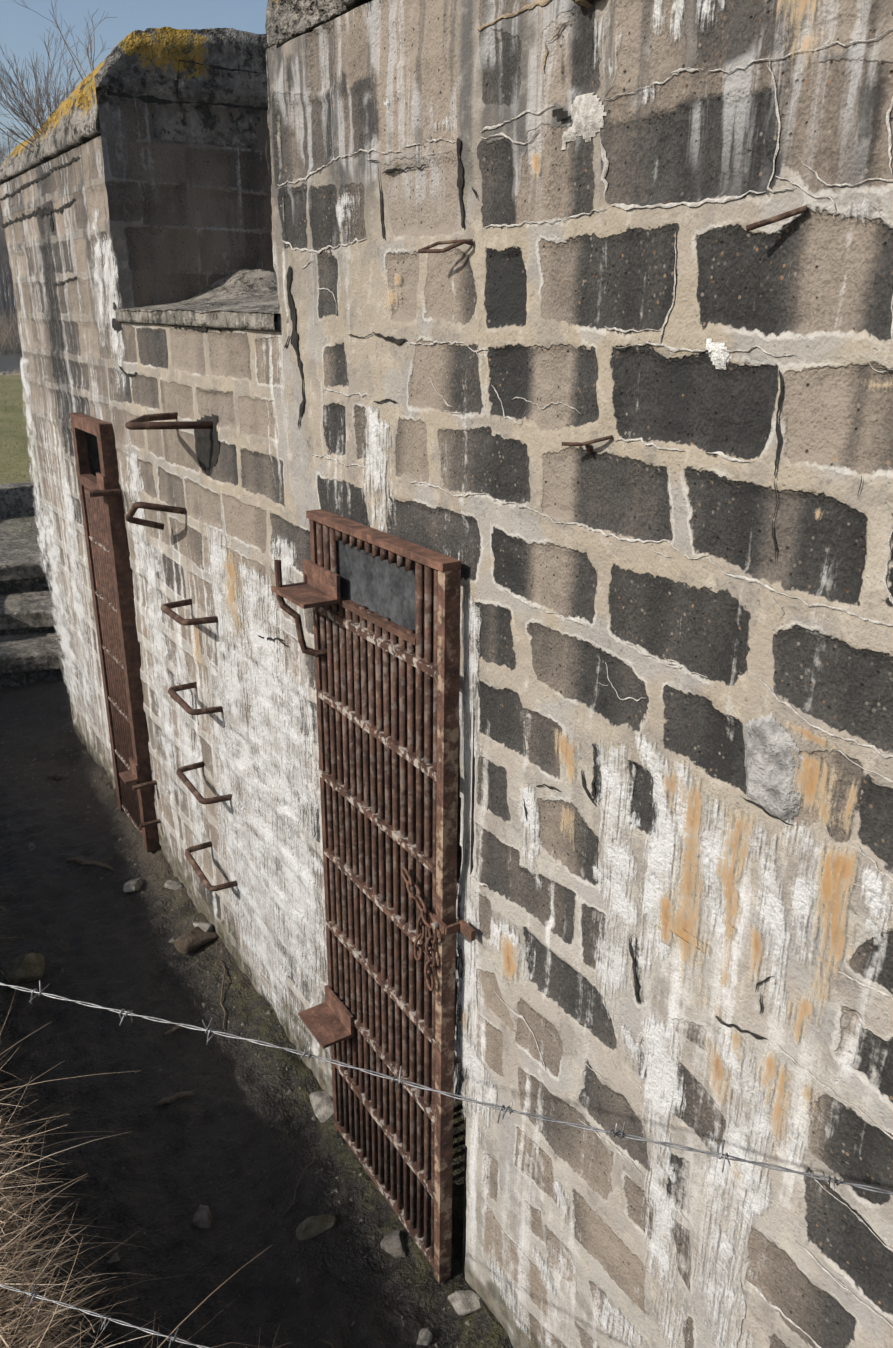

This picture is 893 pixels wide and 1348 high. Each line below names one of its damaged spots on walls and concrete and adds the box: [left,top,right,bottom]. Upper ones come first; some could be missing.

crack [476,0,599,73]
leakage [561,19,621,84]
leakage [653,0,724,41]
leakage [859,82,883,139]
crack [107,28,893,627]
corrosion [658,774,709,965]
corrosion [717,811,753,986]
corrosion [500,935,517,977]
crack [604,917,640,1003]
corrosion [787,845,857,1041]
corrosion [711,1044,730,1100]
corrosion [762,1055,814,1139]